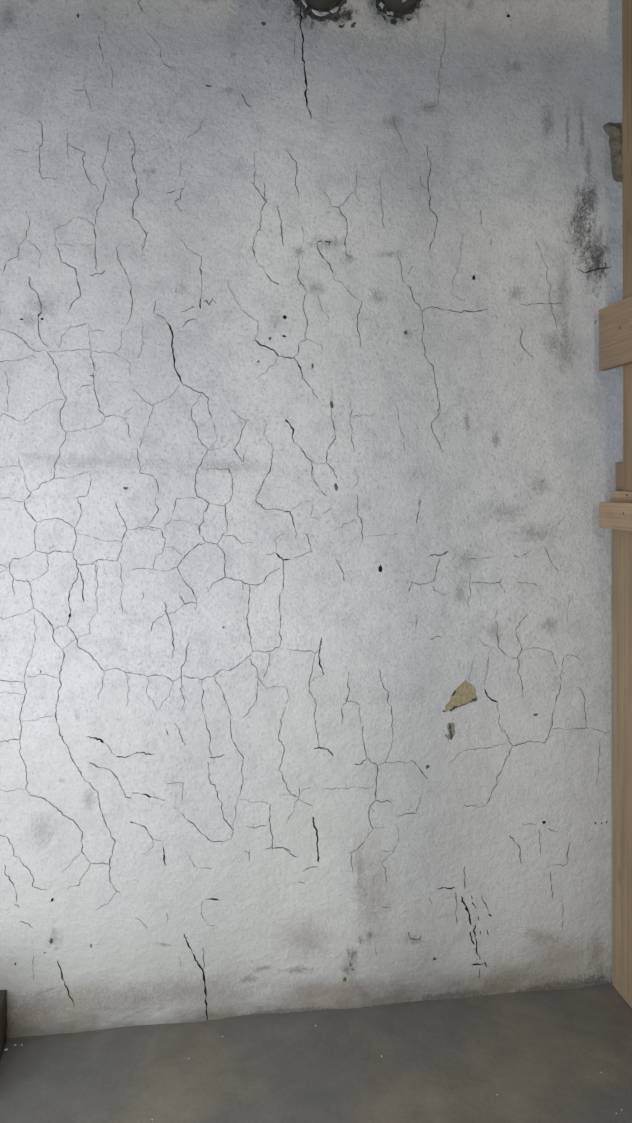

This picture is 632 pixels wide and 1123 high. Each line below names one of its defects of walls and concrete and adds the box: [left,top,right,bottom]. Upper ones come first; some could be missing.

crack [241,7,329,116]
crack [0,121,610,930]
flaking render [443,680,477,740]
crack [32,955,74,1004]
crack [138,898,218,1020]
crack [429,867,491,977]